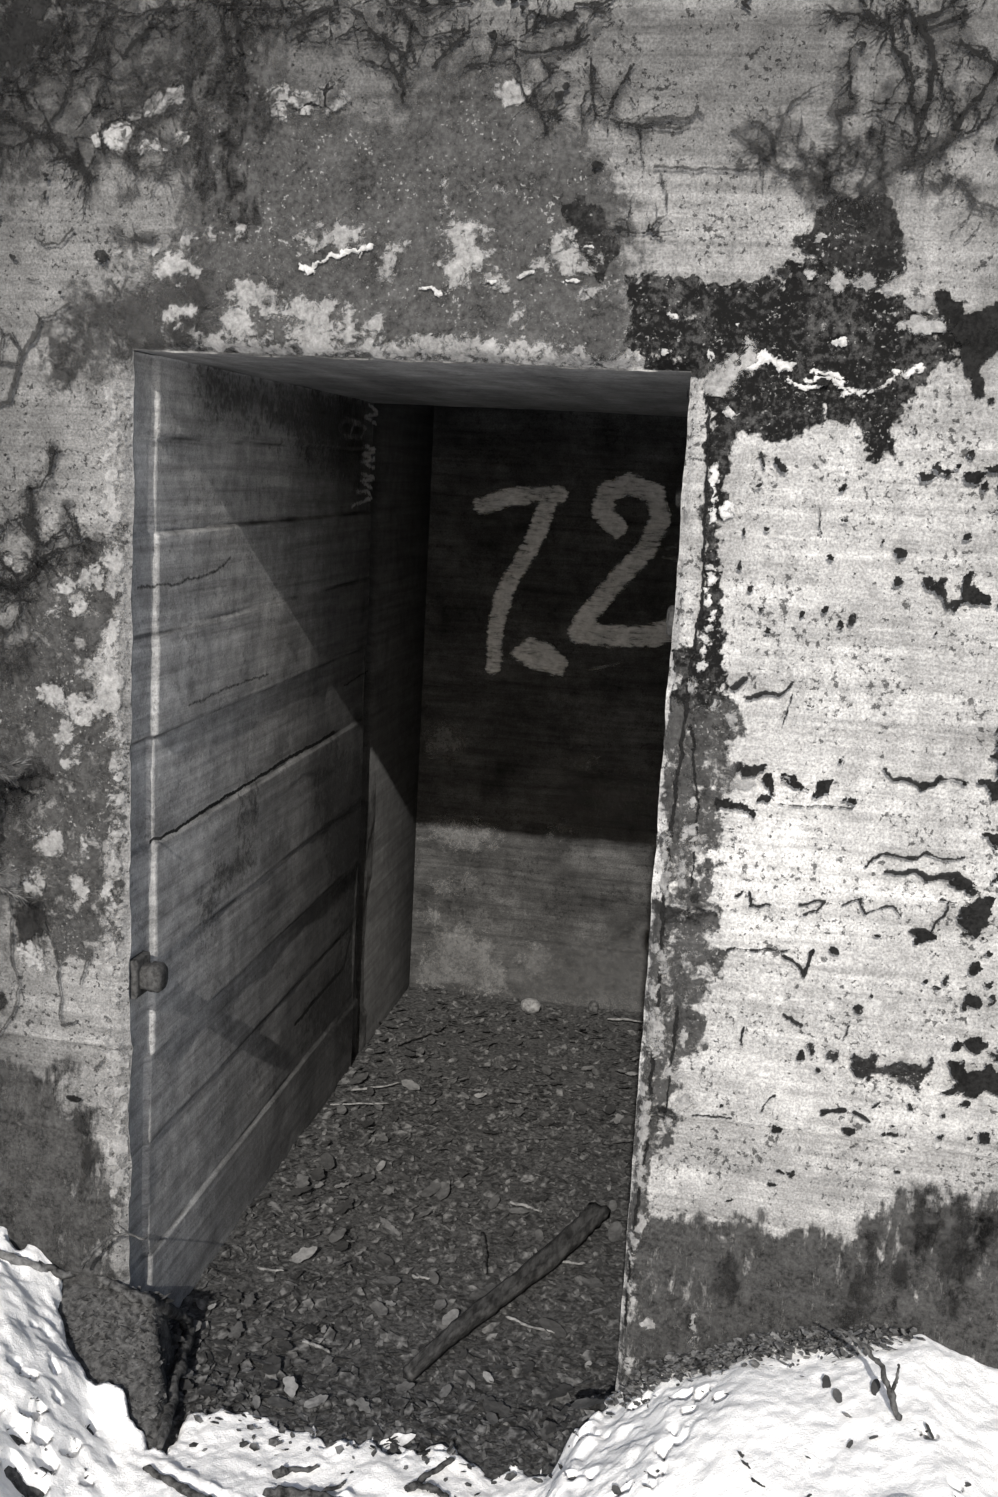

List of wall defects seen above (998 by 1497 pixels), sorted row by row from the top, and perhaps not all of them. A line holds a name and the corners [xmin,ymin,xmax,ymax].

peeling [90,84,190,155]
peeling [109,179,633,368]
peeling [804,268,946,335]
spalling [687,323,926,419]
leakage [40,0,998,923]
leakage [0,523,129,965]
crack [729,676,794,724]
crack [726,947,814,979]
crack [734,851,973,937]
leakage [949,873,998,1011]
leakage [619,898,998,1372]
crack [820,1101,881,1123]